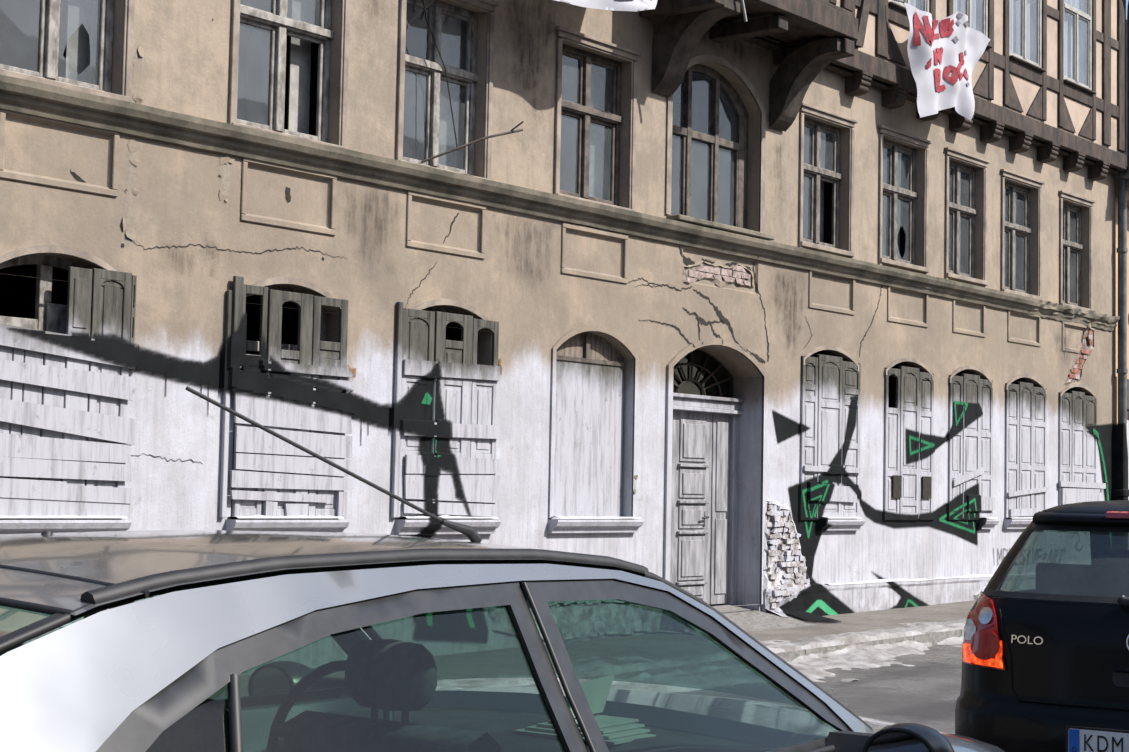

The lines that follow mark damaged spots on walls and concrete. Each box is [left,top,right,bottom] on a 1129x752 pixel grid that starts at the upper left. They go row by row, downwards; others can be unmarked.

crack [128,239,347,259]
crack [405,212,459,307]
crack [628,246,769,364]
flaking render [682,260,754,288]
flaking render [763,498,811,617]